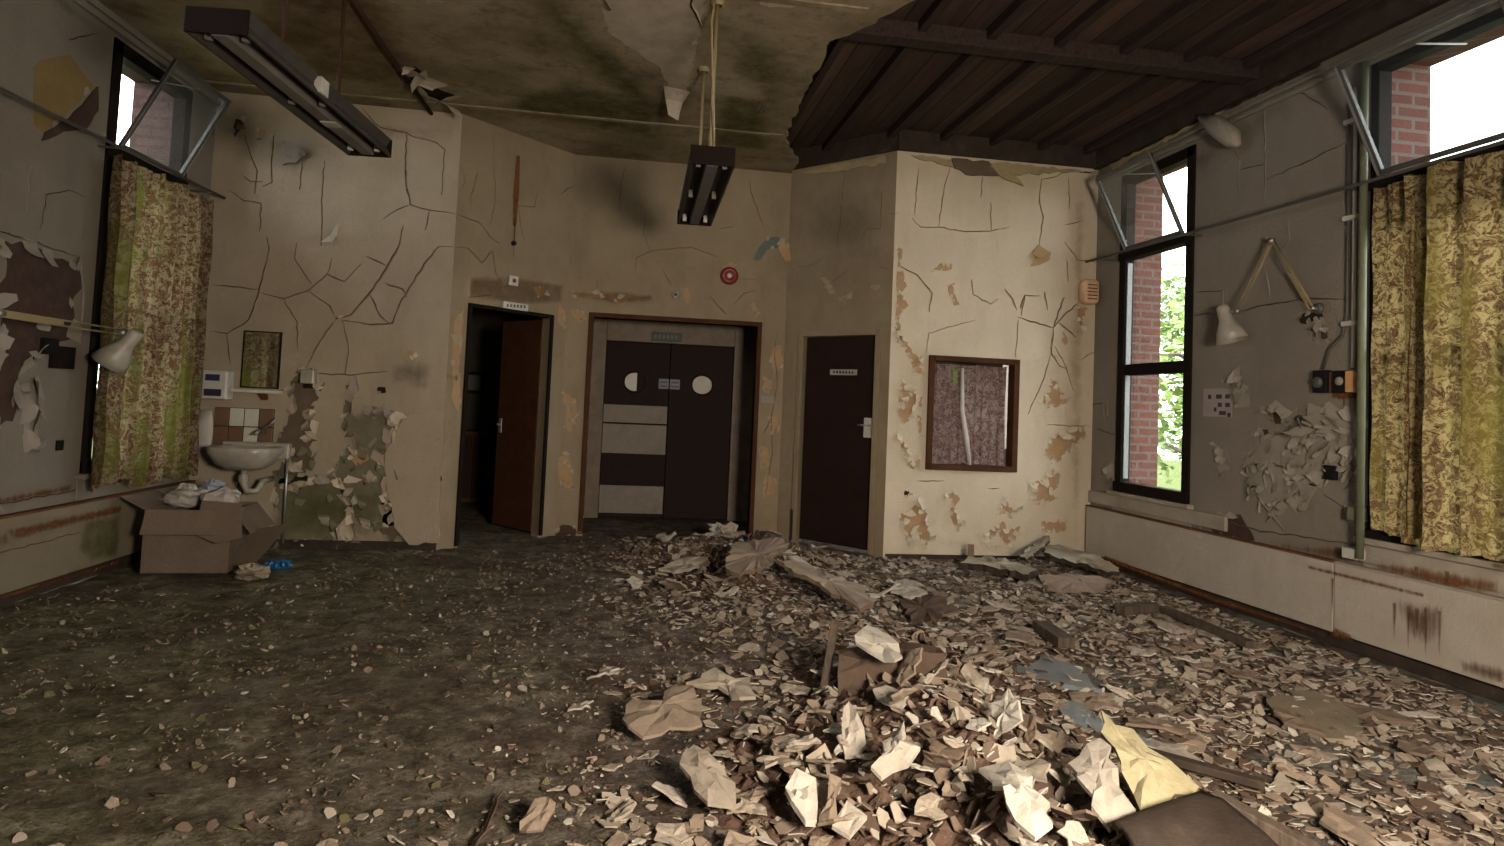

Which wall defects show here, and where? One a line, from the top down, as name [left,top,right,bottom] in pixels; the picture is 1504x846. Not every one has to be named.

peeling [0,237,83,453]
corrosion [14,508,120,536]
peeling [269,310,464,550]
crack [212,108,574,386]
peeling [870,245,966,553]
crack [833,169,1115,435]
peeling [980,423,1088,548]
peeling [1031,245,1051,266]
peeling [1038,378,1072,408]